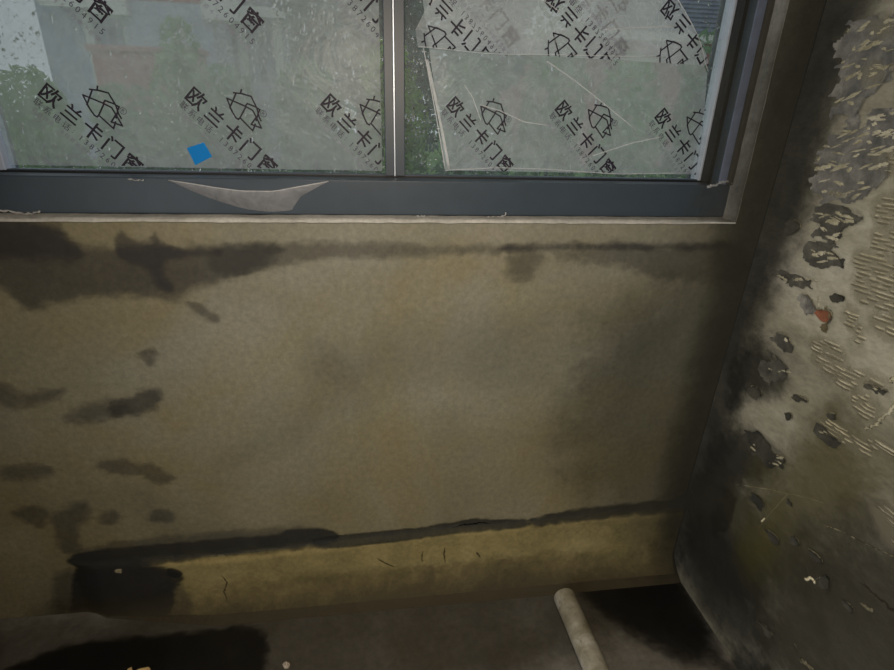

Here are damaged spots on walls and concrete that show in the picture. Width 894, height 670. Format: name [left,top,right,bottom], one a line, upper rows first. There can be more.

flaking render [784,14,894,269]
flaking render [778,269,845,333]
damp [529,0,894,670]
flaking render [747,331,794,400]
flaking render [863,380,888,396]
flaking render [742,430,786,469]
flaking render [813,412,841,448]
damp [68,519,529,617]
damp [7,626,268,670]